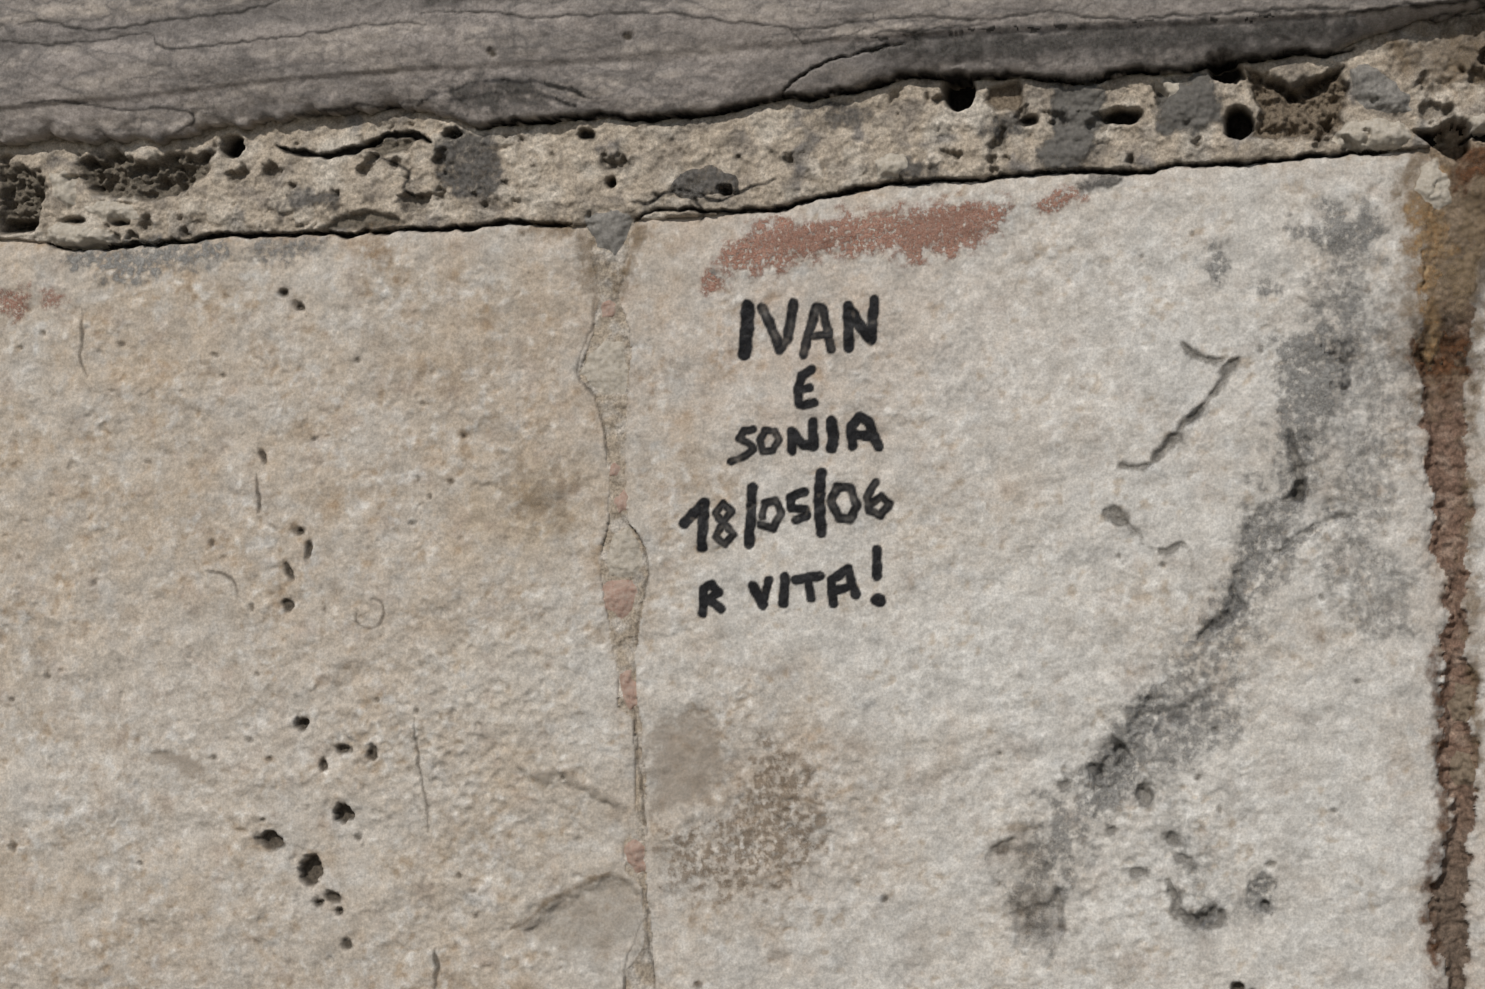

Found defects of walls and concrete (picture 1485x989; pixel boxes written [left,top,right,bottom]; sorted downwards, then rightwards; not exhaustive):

crack [19,3,417,49]
crack [460,0,1485,130]
crack [50,100,572,251]
crack [637,149,1409,220]
corrosion [1438,147,1485,192]
crack [1459,133,1485,146]
corrosion [1393,159,1476,386]
crack [1119,342,1240,470]
damp [1011,199,1384,938]
corrosion [1428,653,1444,712]
corrosion [1437,789,1449,832]
corrosion [1421,914,1438,967]